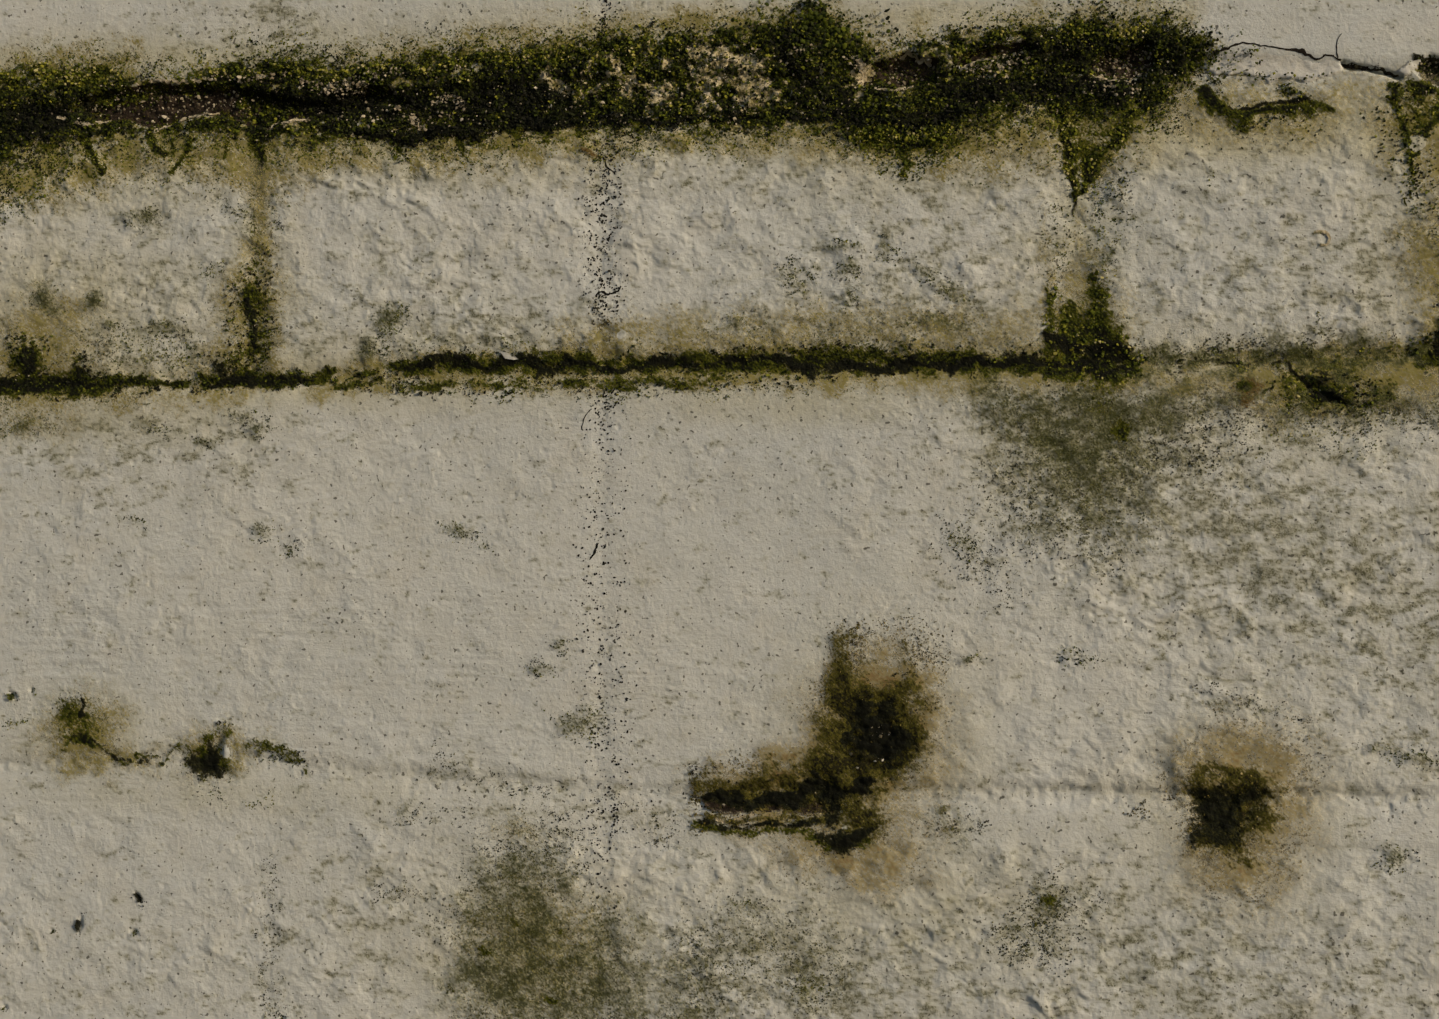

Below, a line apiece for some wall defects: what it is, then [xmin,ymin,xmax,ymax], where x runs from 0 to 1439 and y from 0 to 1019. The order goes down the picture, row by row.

peeling [1188,29,1344,89]
spalling [1395,53,1439,86]